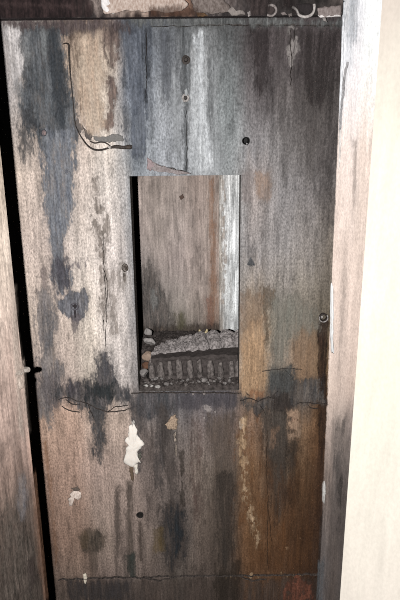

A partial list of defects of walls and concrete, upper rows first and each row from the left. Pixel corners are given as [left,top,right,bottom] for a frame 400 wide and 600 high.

spalling [74,34,124,143]
crack [145,24,340,98]
damp [304,0,357,106]
crack [101,240,109,351]
damp [0,20,325,600]
peeling [123,420,145,481]
crack [58,391,280,418]
peeling [165,414,178,457]
peeling [68,486,81,506]